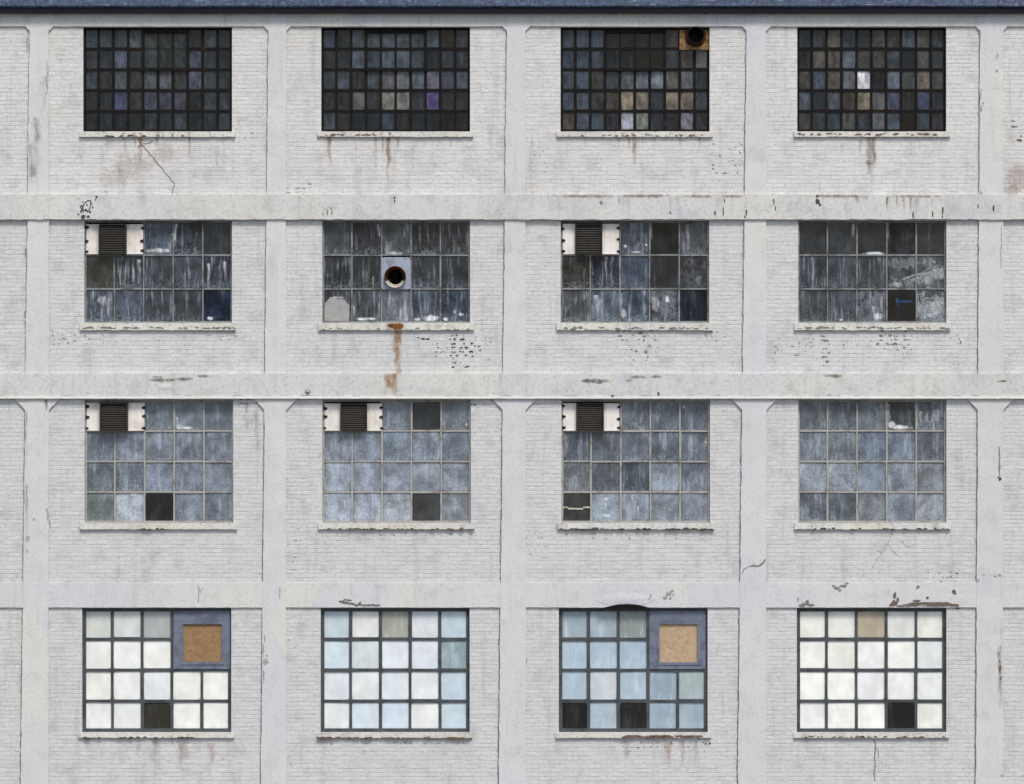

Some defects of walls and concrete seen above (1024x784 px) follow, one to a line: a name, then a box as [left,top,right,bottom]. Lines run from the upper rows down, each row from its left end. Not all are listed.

crack [137,138,175,193]
crack [740,38,748,189]
peeling [410,327,490,368]
crack [738,228,746,371]
crack [739,411,766,580]
spalling [890,572,960,609]
crack [734,610,742,784]
crack [872,740,880,782]